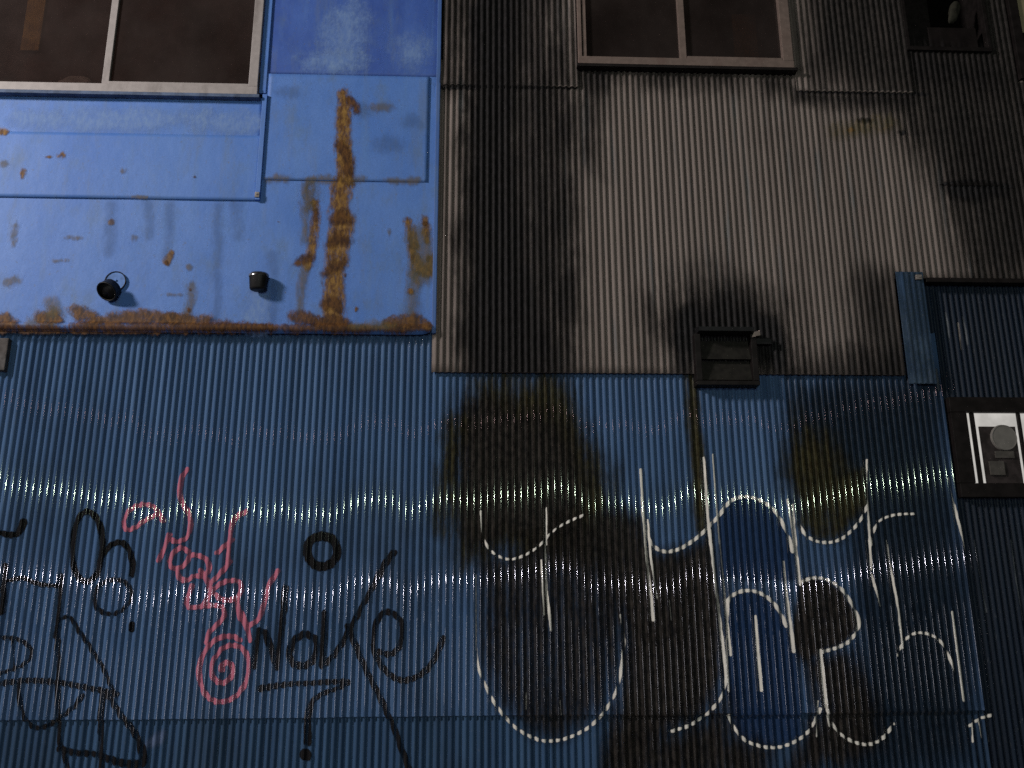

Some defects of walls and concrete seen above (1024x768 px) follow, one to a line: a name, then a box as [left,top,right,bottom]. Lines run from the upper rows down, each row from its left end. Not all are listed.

rust [0,89,433,335]